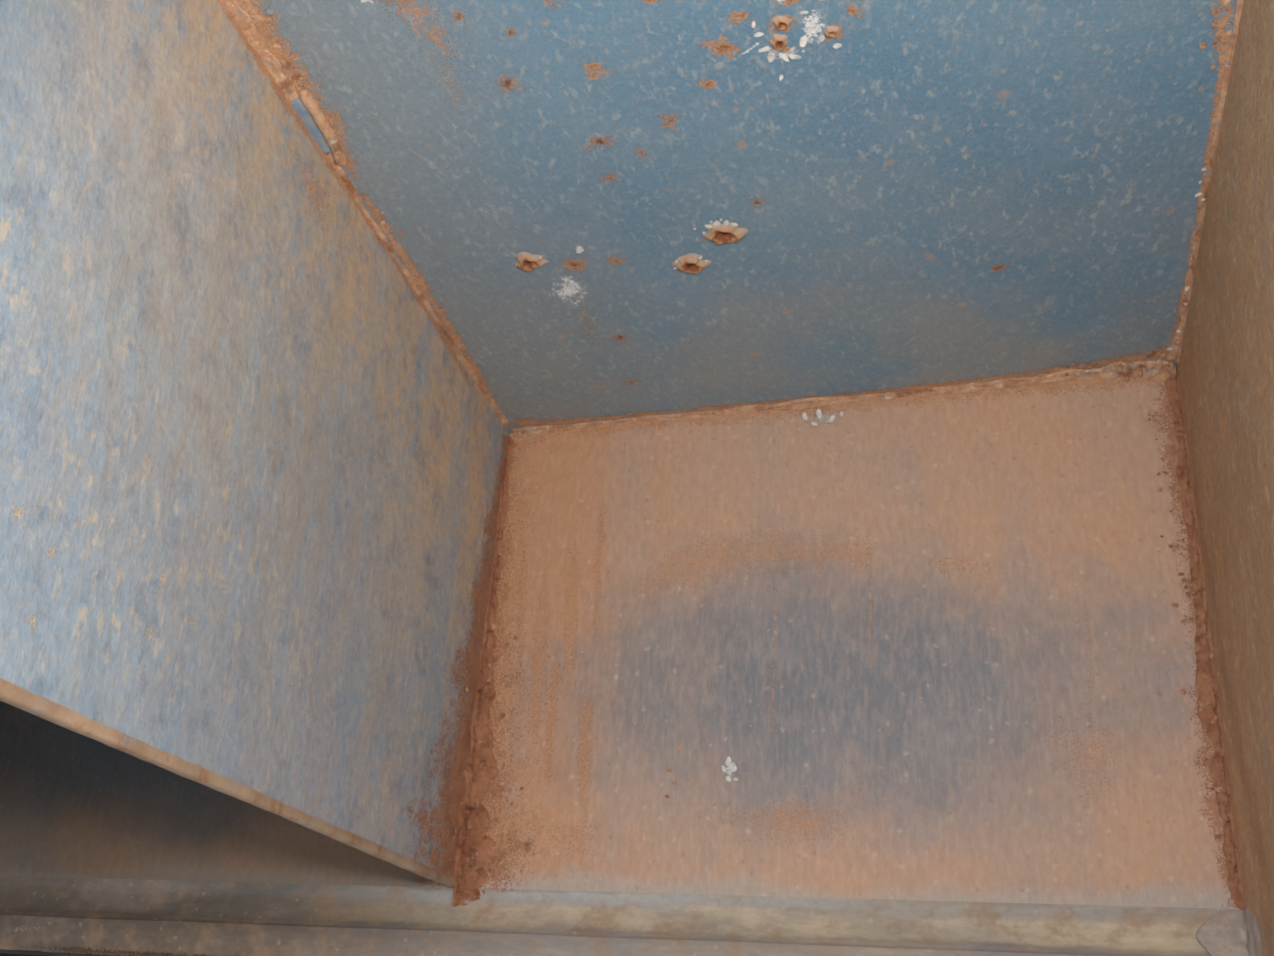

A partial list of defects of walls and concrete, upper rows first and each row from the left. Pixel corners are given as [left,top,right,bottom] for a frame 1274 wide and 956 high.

peeling [282,78,347,166]
corrosion [217,0,1244,910]